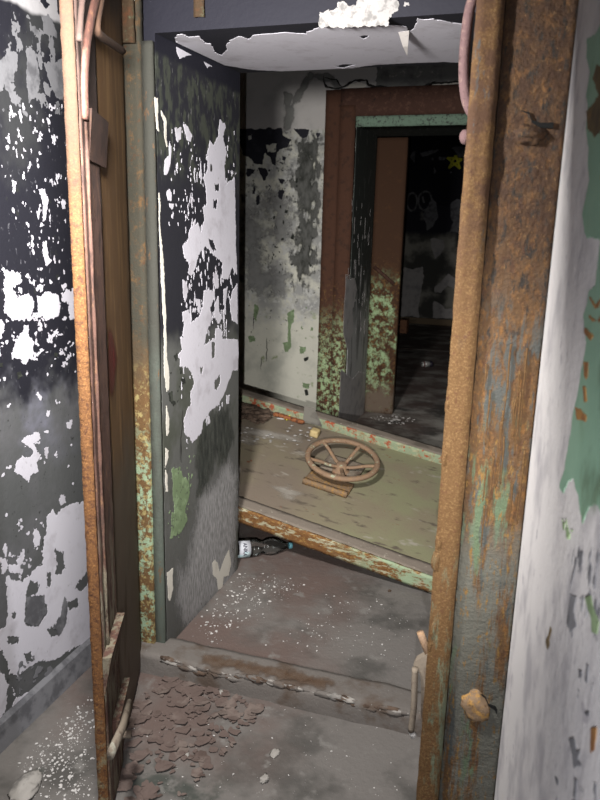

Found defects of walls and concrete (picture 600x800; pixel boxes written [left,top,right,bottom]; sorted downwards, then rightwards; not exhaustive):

peeling [0,0,64,193]
peeling [240,127,321,200]
peeling [175,0,462,71]
peeling [0,173,74,376]
peeling [154,97,239,443]
peeling [559,26,600,524]
peeling [1,430,57,483]
peeling [0,495,90,718]
peeling [165,448,193,539]
peeling [212,550,231,590]
rust [481,344,517,547]
spalling [566,548,600,642]